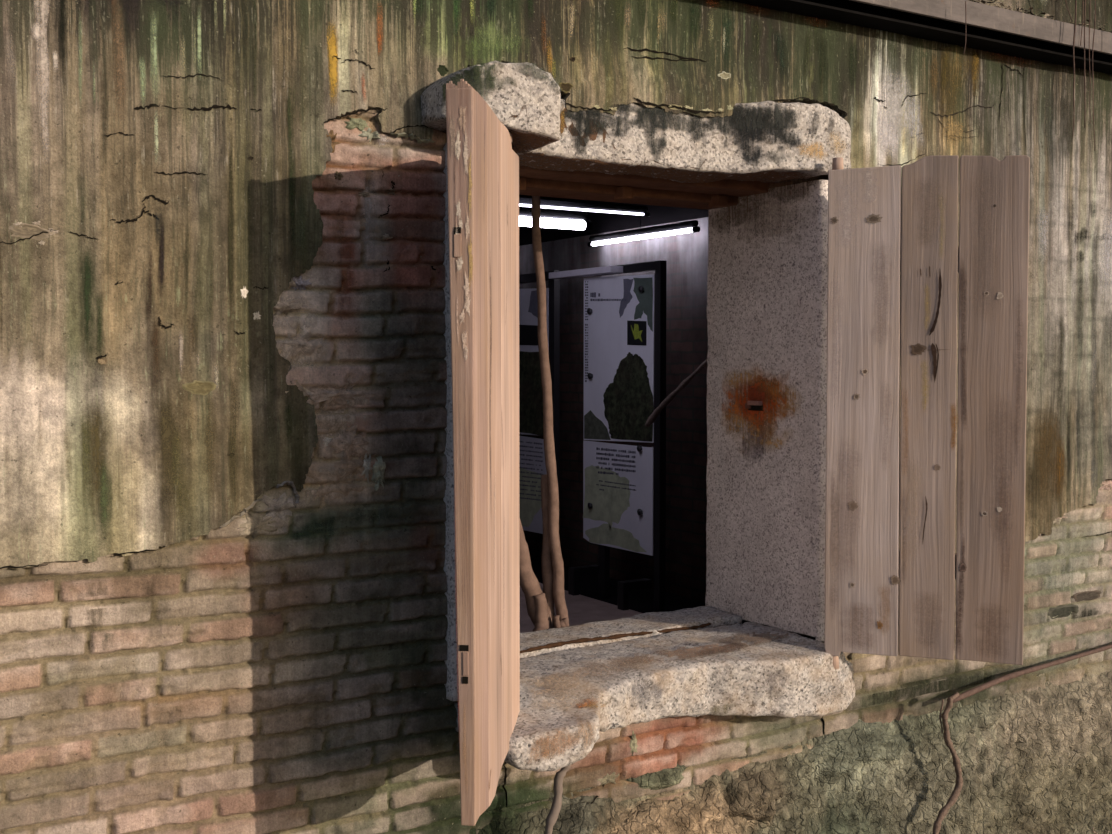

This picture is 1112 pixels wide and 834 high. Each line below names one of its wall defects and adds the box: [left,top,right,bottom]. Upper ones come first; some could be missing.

damp [34,0,66,141]
crack [104,74,262,137]
spalling [559,82,574,93]
crack [624,47,706,62]
damp [562,103,833,164]
crack [0,171,207,244]
damp [147,215,164,309]
damp [83,255,102,351]
rust [722,371,796,449]
peeling [0,108,560,834]
crack [520,623,711,654]
peeling [562,479,1112,803]